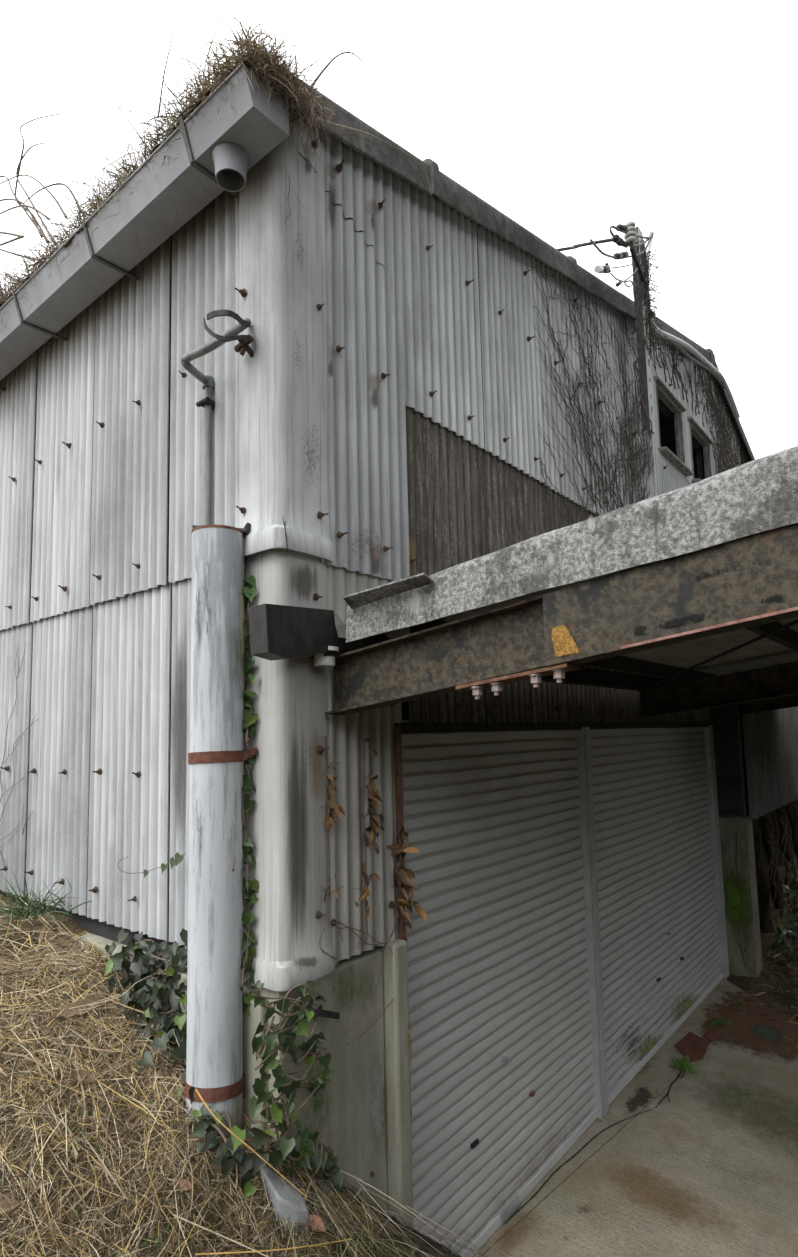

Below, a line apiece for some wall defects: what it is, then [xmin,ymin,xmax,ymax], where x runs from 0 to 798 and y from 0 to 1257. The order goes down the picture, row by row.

rust [192,524,243,533]